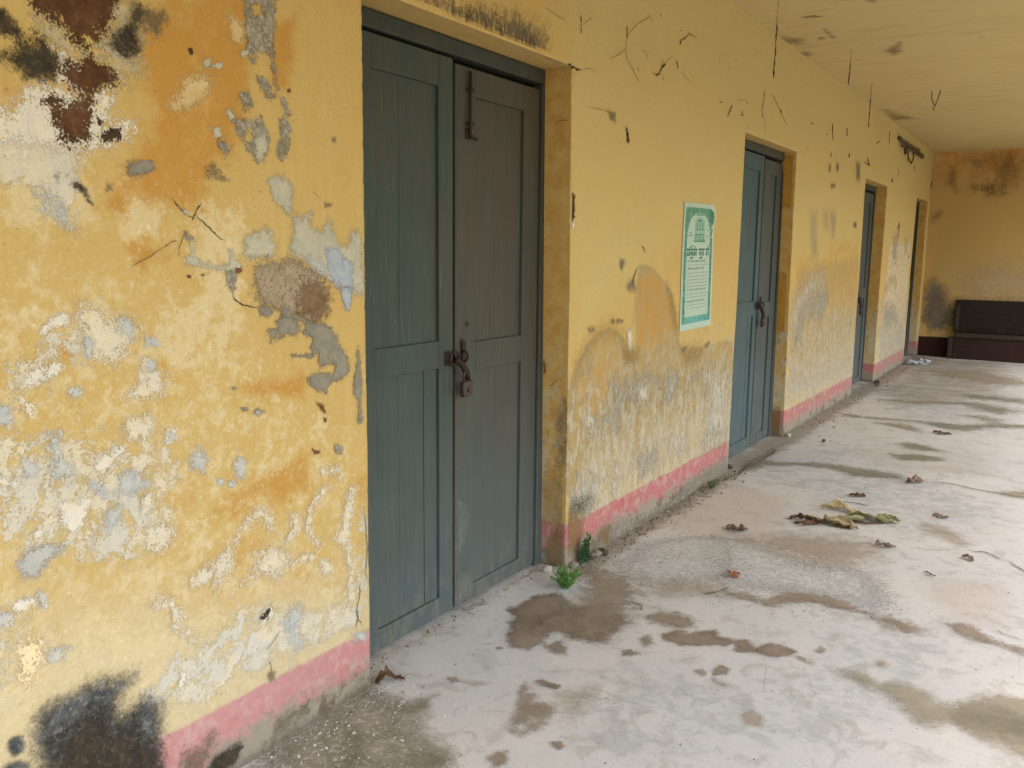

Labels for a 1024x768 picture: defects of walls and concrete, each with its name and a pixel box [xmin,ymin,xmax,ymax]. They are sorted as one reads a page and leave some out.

leakage [0,8,63,84]
peeling [0,0,157,178]
leakage [109,3,168,59]
peeling [165,48,223,113]
leakage [425,0,550,49]
crack [134,197,259,308]
peeling [210,0,366,424]
peeling [0,296,179,628]
leakage [593,458,728,549]
peeling [148,463,361,647]
peeling [8,629,73,691]
leakage [6,673,165,768]